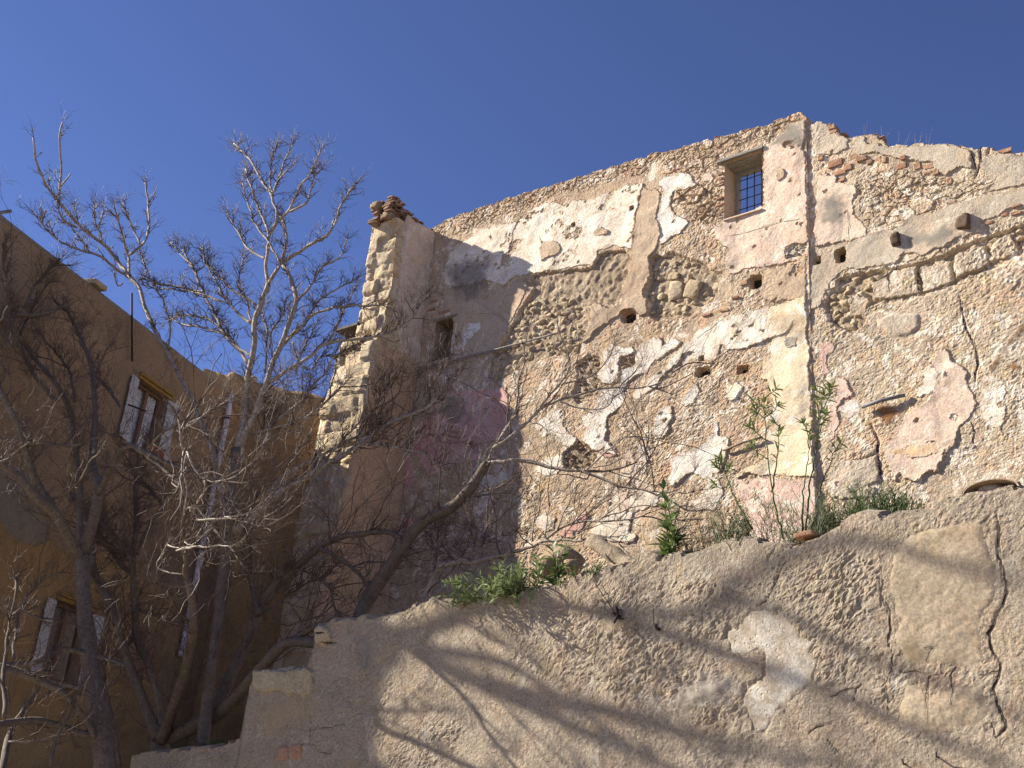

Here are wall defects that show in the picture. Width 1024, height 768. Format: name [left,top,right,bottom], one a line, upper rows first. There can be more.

flaking render [443,120,1024,517]
crack [960,300,979,380]
flaking render [535,382,701,544]
spalling [728,610,818,732]
crack [831,514,1009,738]